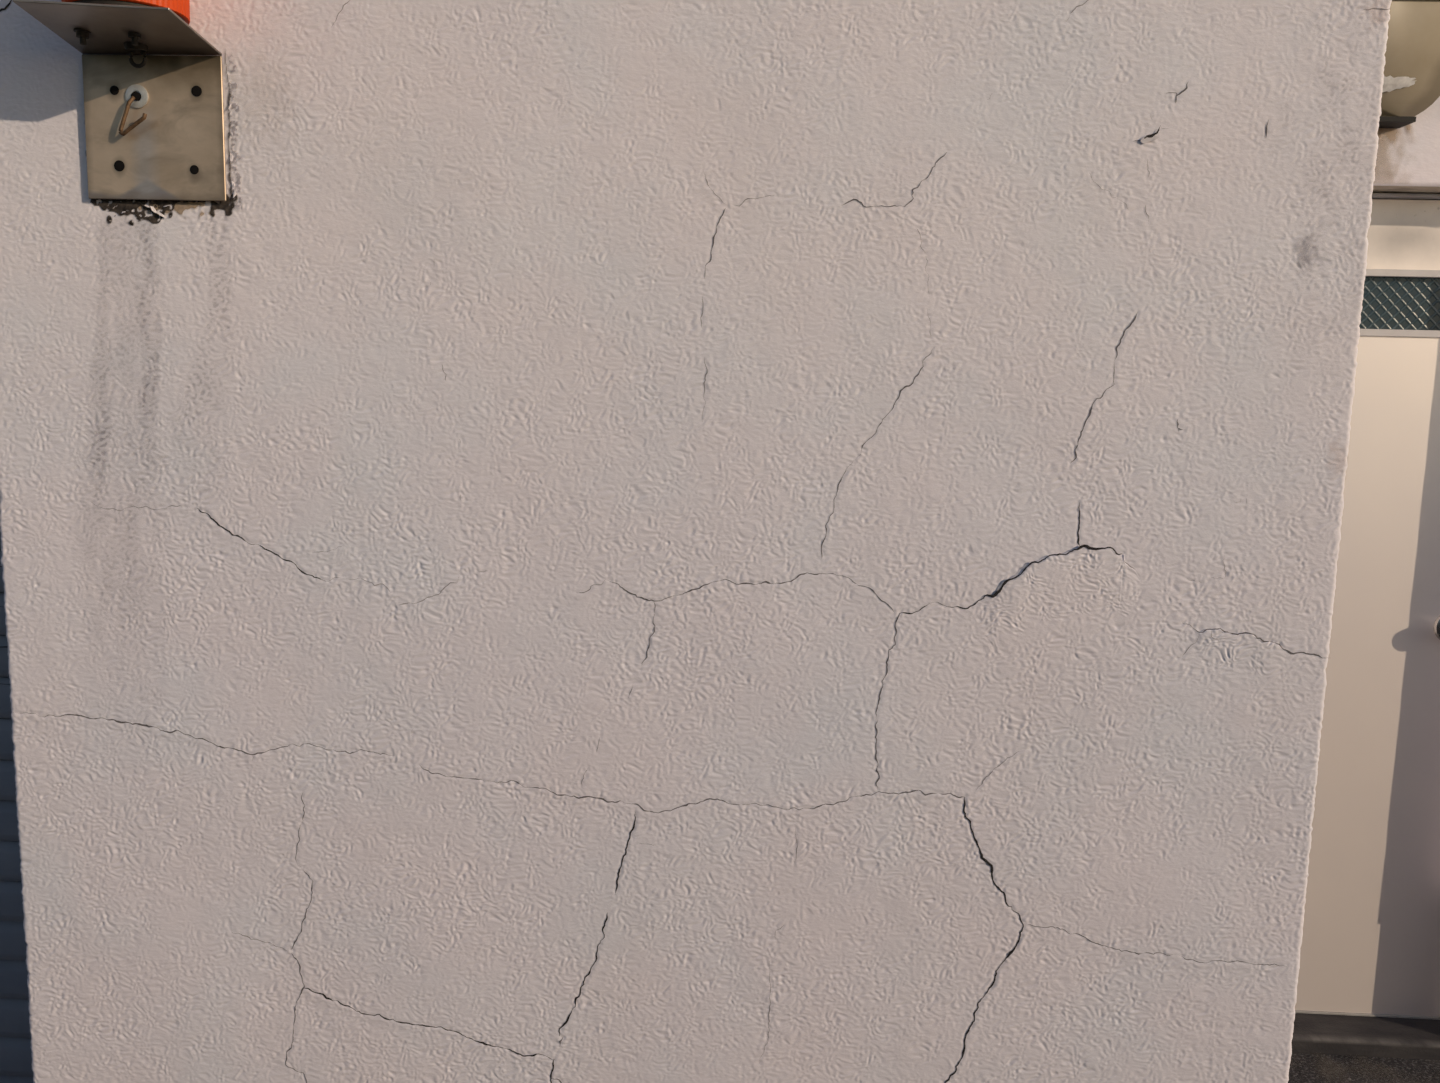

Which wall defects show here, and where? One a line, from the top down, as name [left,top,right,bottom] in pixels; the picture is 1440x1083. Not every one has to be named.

crack [94,504,485,606]
crack [232,152,1287,1083]
crack [1182,623,1322,658]
crack [13,712,393,761]